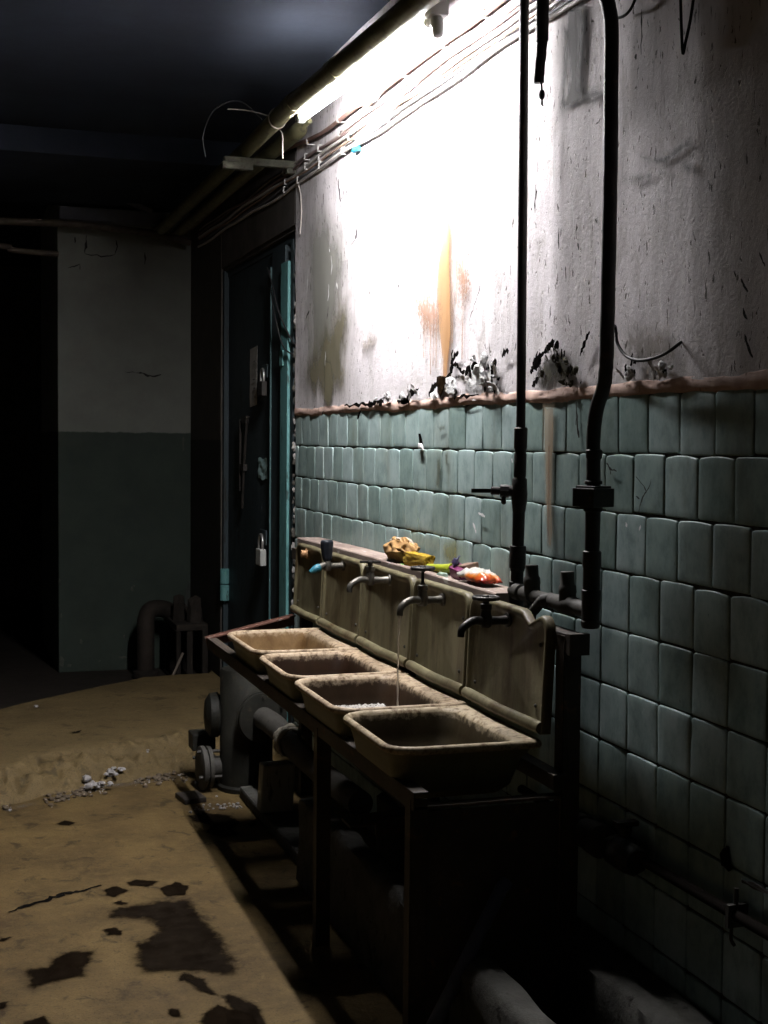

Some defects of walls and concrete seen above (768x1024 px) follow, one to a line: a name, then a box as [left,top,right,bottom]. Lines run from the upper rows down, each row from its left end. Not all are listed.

corrosion [414,202,472,377]
flaking render [344,348,509,408]
flaking render [616,353,674,382]
corrosion [544,408,553,546]
crack [9,885,101,912]
water stain [26,951,93,988]
water stain [104,880,266,1024]
water stain [23,1016,50,1024]